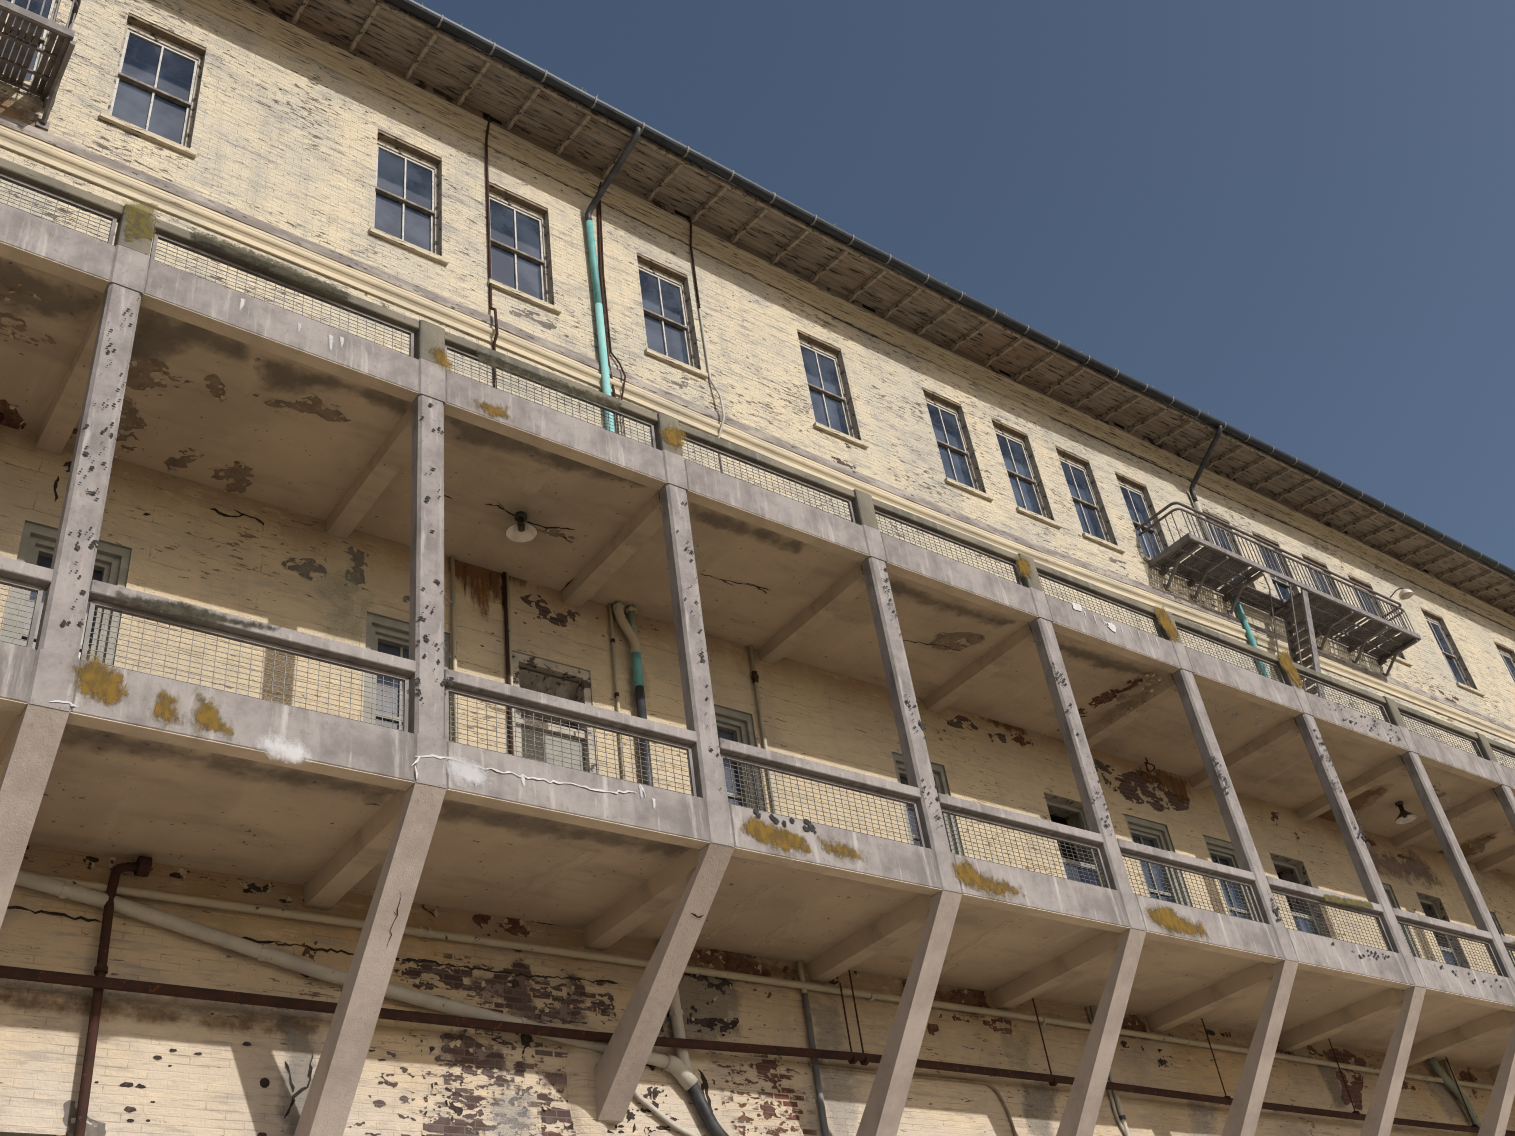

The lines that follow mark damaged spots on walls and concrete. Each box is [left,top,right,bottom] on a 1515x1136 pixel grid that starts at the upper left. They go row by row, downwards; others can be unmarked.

peeling [116,359,228,453]
peeling [253,394,351,425]
peeling [281,546,369,591]
spalling [1078,677,1145,717]
peeling [1093,759,1190,812]
peeling [712,1054,816,1136]
peeling [1276,1041,1366,1110]